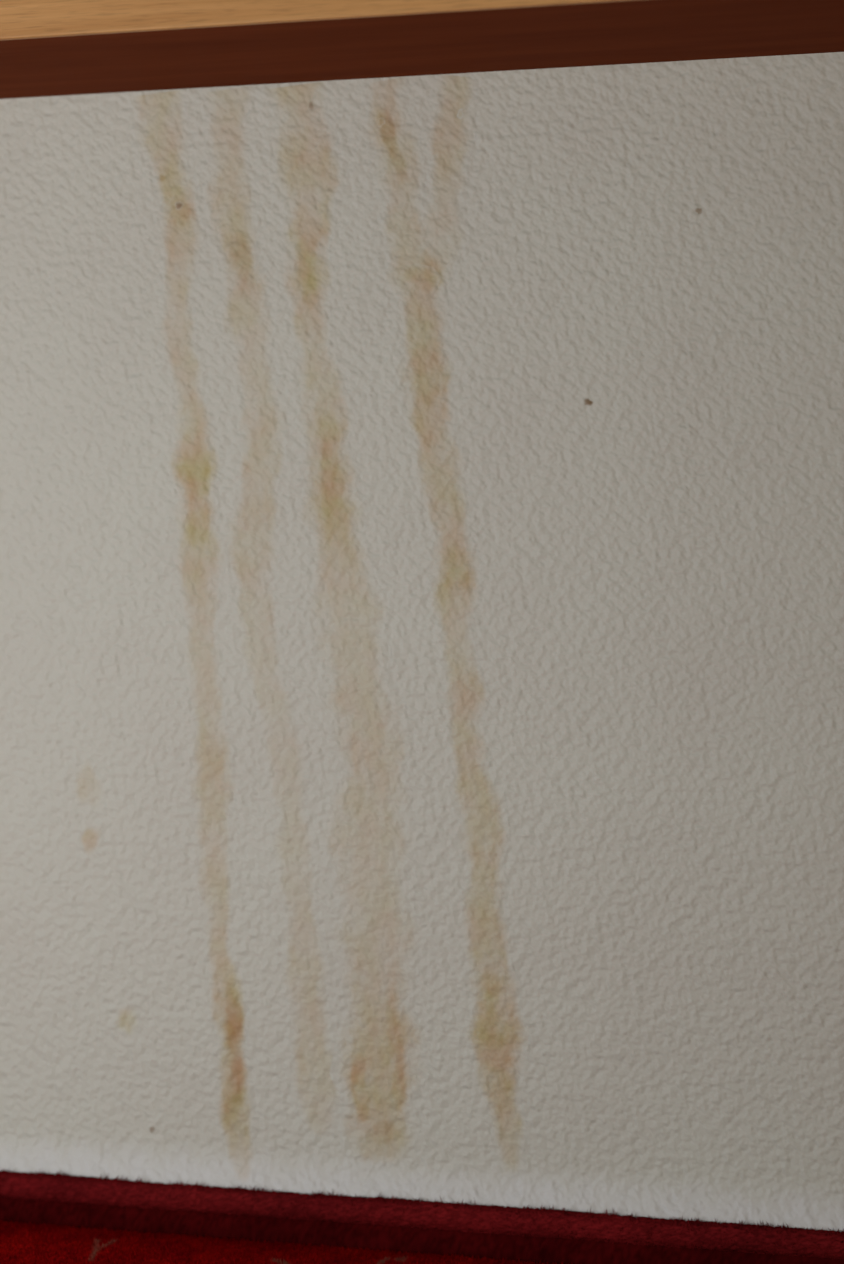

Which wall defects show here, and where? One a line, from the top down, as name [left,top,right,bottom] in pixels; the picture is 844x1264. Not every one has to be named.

water stain [128,81,430,1186]
water stain [363,75,531,1177]